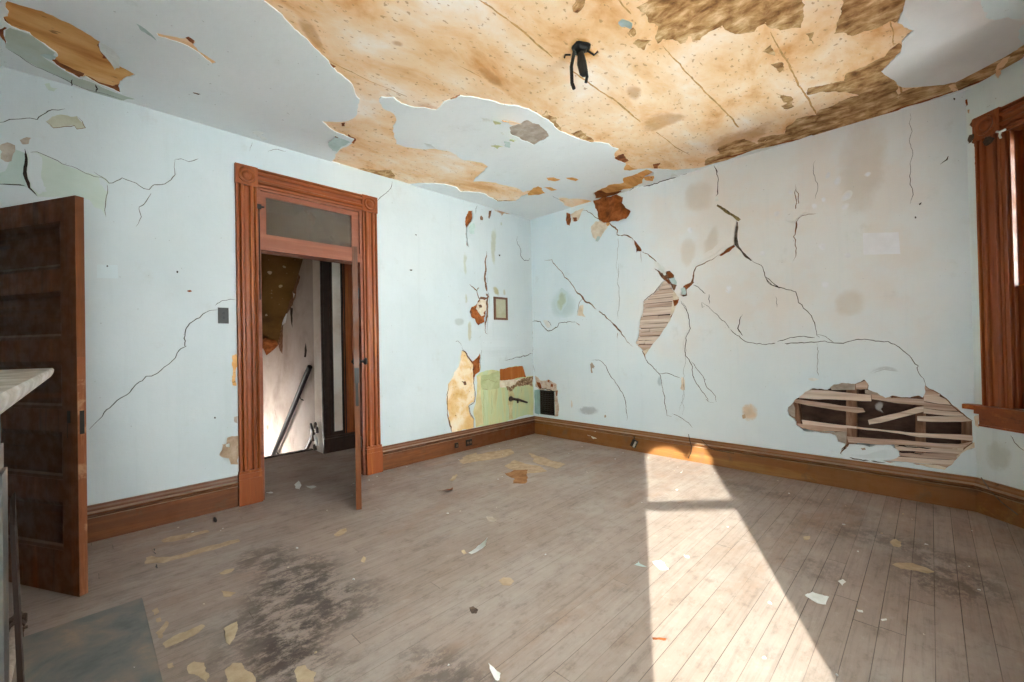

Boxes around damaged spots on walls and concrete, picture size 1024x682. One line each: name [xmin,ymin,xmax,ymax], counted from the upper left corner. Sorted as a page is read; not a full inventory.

damp [292,12,326,56]
peeling [882,0,1024,127]
crack [3,149,47,195]
peeling [0,137,109,216]
flaking render [482,118,549,149]
damp [637,109,692,134]
damp [699,115,783,157]
damp [830,113,898,230]
flaking render [658,269,694,318]
crack [517,166,926,427]
crack [100,299,235,419]
peeling [446,350,559,432]